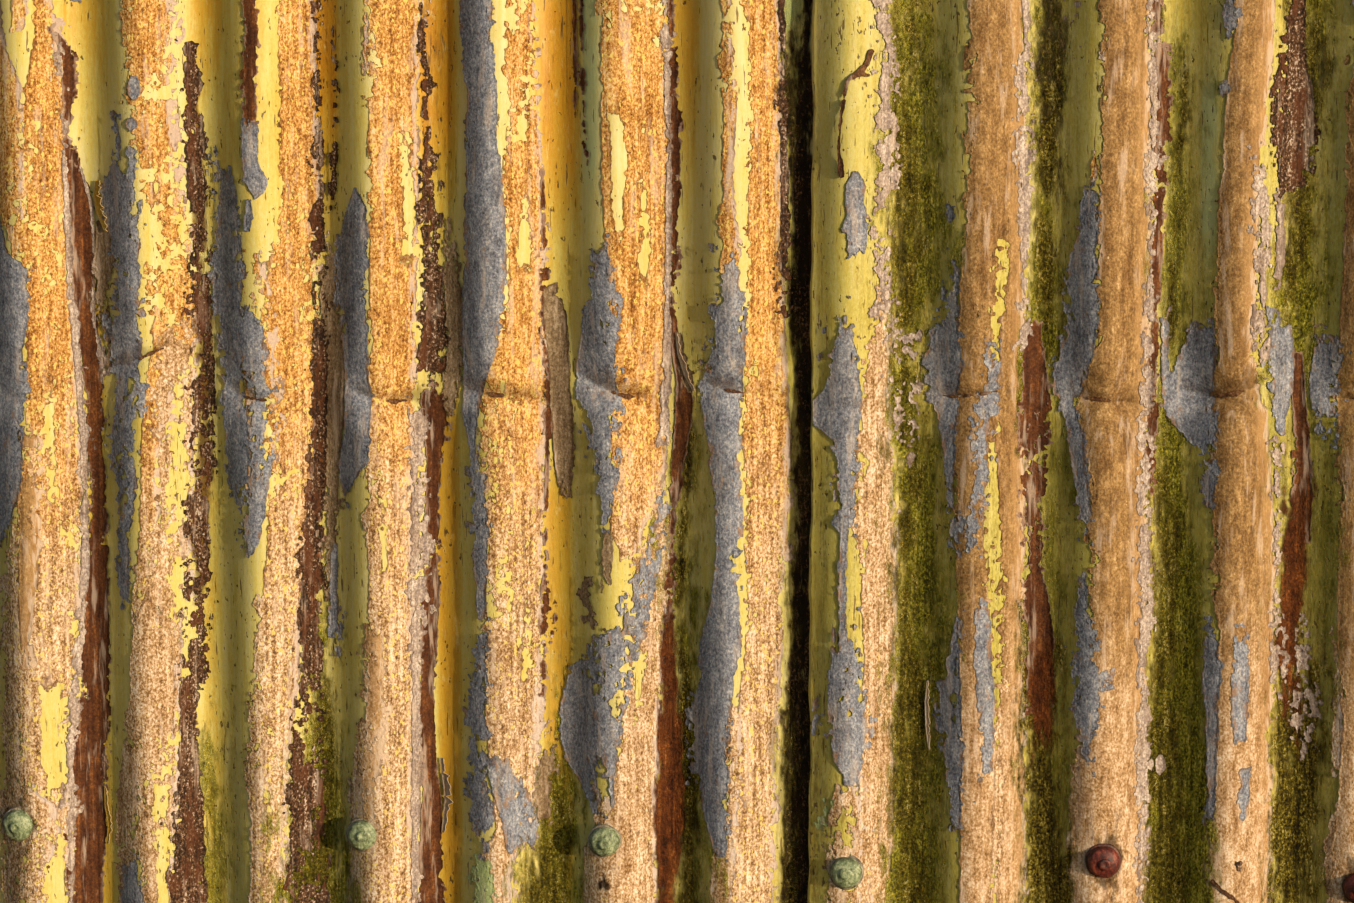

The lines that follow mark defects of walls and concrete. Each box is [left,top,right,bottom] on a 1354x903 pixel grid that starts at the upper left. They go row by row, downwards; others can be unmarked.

rust [47,22,112,903]
rust [298,419,327,675]
peeling [0,0,797,903]
rust [653,0,693,903]
peeling [811,281,901,903]
water stain [866,0,924,468]
rust [1015,320,1056,757]
peeling [1048,0,1354,903]
rust [1273,352,1317,747]